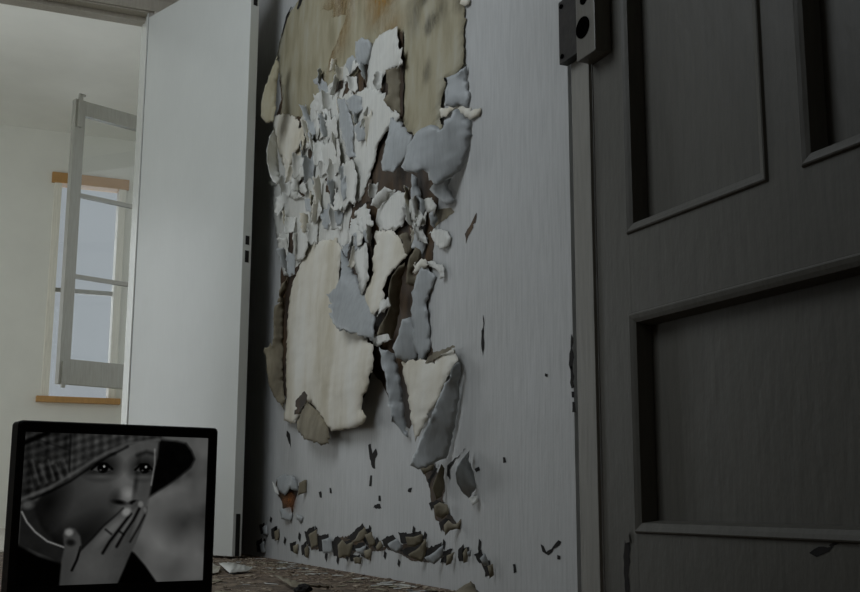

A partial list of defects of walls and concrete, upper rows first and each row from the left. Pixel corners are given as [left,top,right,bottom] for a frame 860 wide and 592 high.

peeling [256,0,494,579]